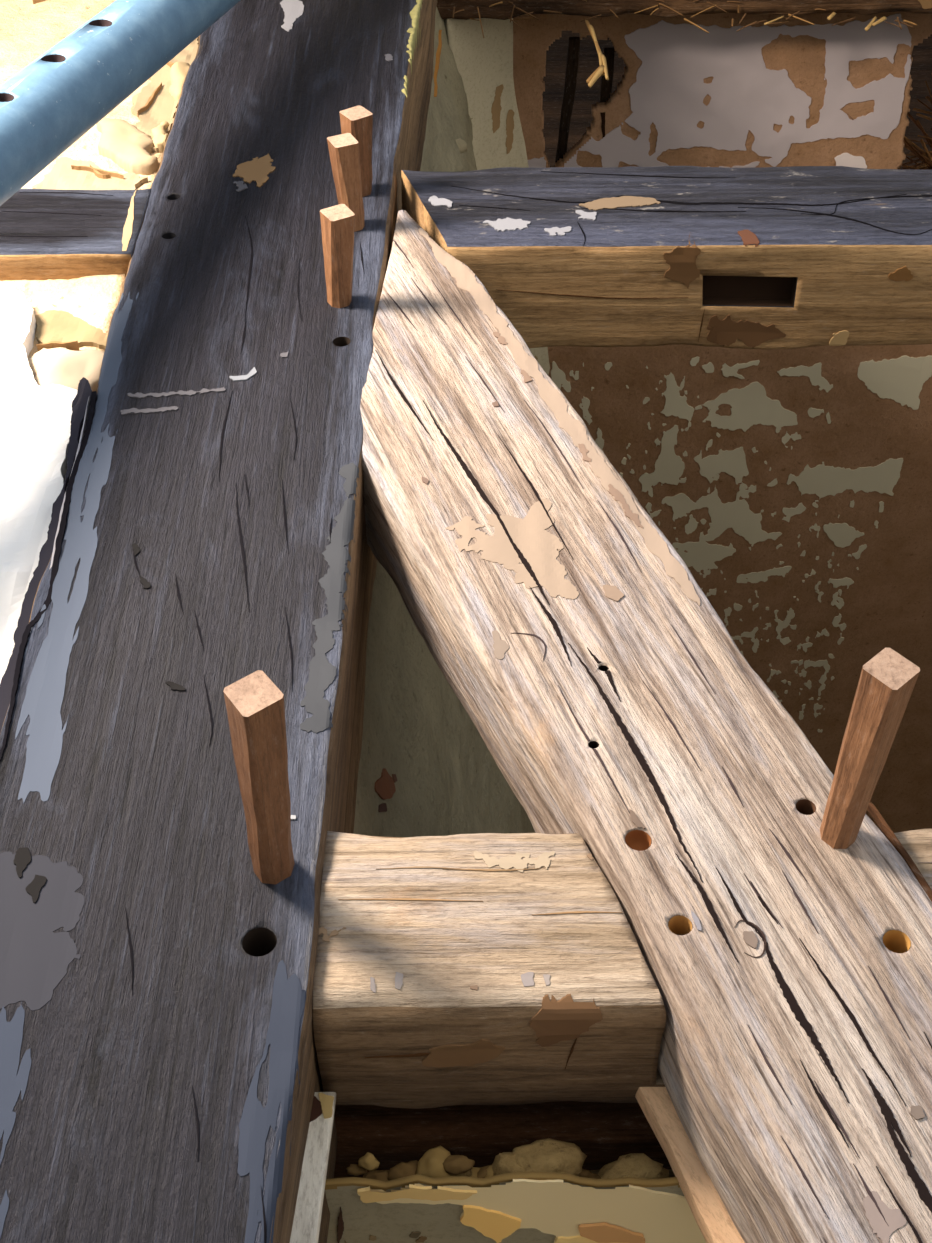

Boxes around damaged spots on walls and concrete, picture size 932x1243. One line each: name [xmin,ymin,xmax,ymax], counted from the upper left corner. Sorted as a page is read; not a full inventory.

peeling [491,84,515,154]
peeling [564,13,912,168]
peeling [49,396,90,570]
spalling [300,462,360,733]
crack [375,349,932,1243]
hole [13,847,47,903]
crack [337,1207,347,1243]